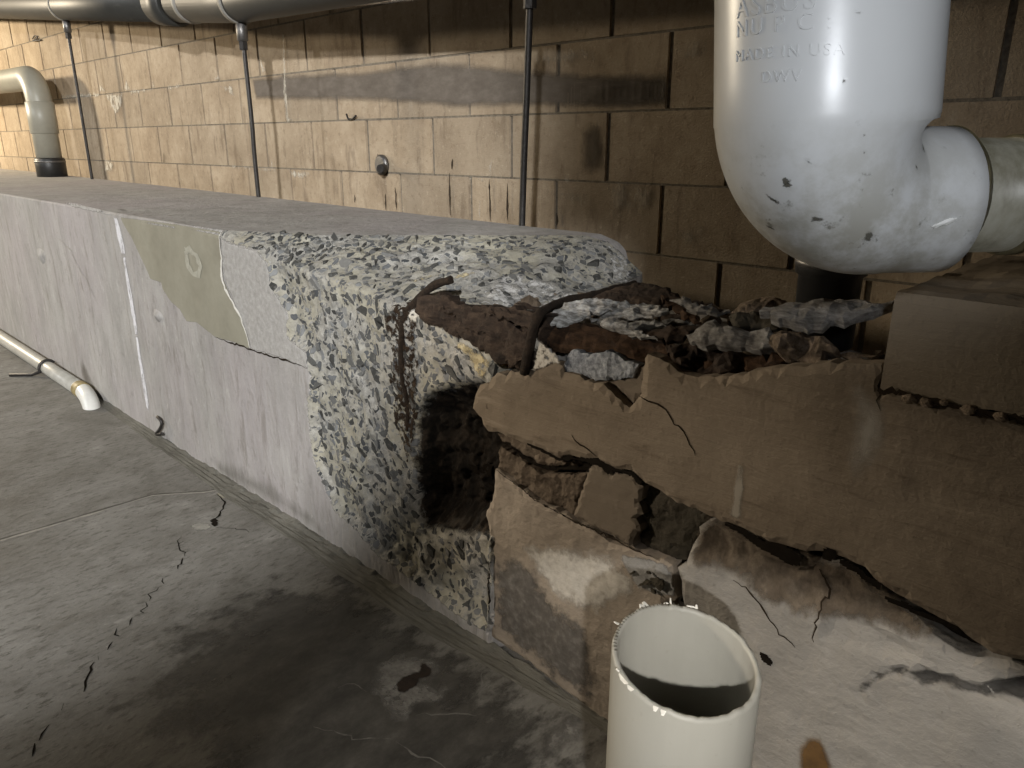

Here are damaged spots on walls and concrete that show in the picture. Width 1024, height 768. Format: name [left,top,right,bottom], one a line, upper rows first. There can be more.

crack [32,539,186,756]
crack [210,494,248,531]
crack [215,337,308,369]
leakage [149,575,577,768]
leakage [496,547,630,697]
peeling [121,209,1024,660]
corrosion [384,291,787,462]
crack [497,436,687,564]
crack [639,396,695,454]
crack [725,523,981,647]